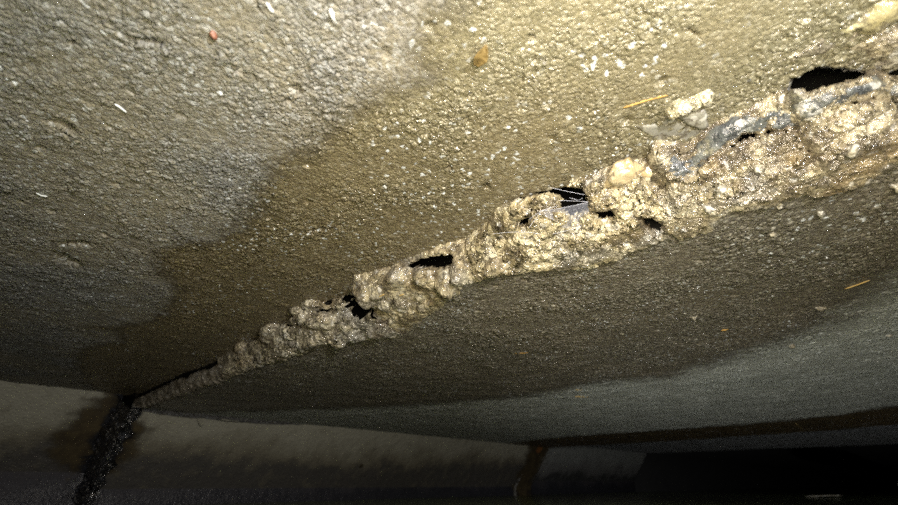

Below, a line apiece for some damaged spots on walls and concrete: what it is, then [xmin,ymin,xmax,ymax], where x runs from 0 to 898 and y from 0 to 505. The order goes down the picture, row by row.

peeling [636,89,714,141]
spalling [844,144,859,158]